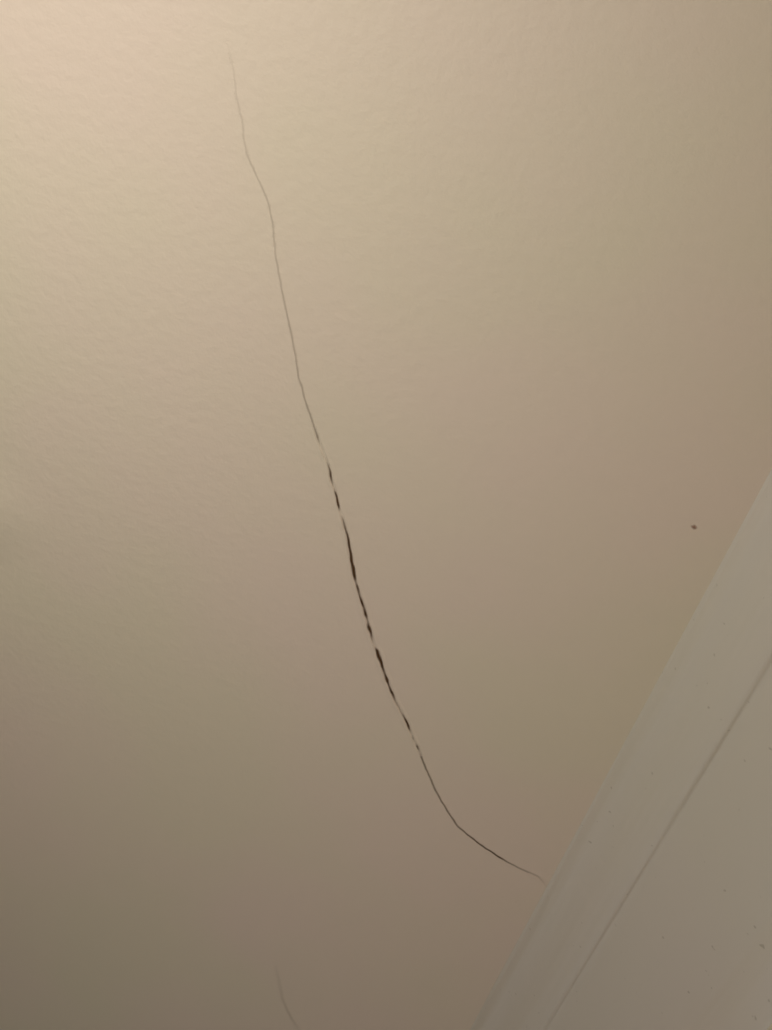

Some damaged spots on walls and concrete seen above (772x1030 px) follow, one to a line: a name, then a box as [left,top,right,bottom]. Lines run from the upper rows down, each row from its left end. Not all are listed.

crack [309,425,425,758]